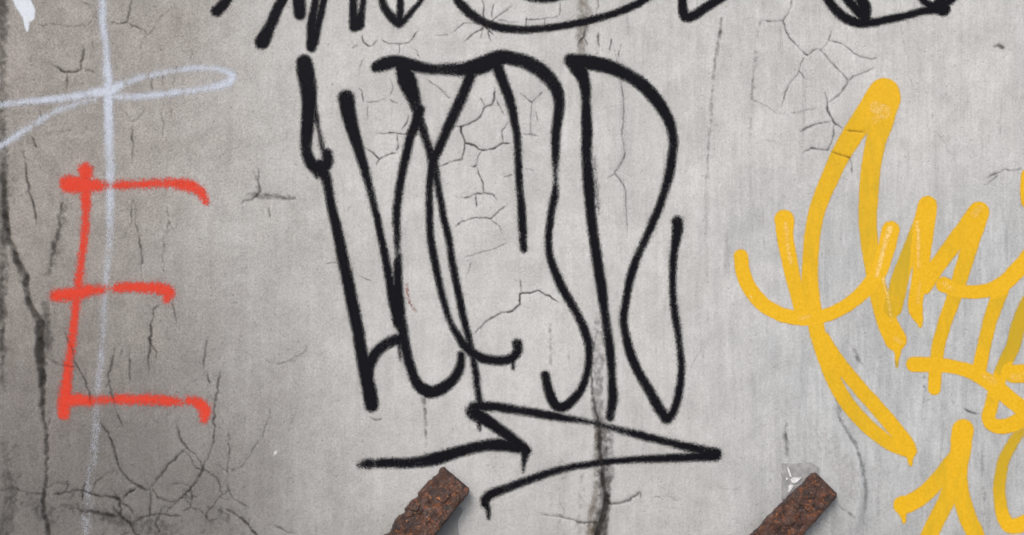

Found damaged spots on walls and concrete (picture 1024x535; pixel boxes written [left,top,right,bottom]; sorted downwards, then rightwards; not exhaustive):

crack [444,91,508,223]
crack [5,216,46,404]
crack [490,290,555,319]
crack [43,432,184,534]
rust [384,467,469,535]
crack [581,421,631,535]
rust [750,472,837,535]